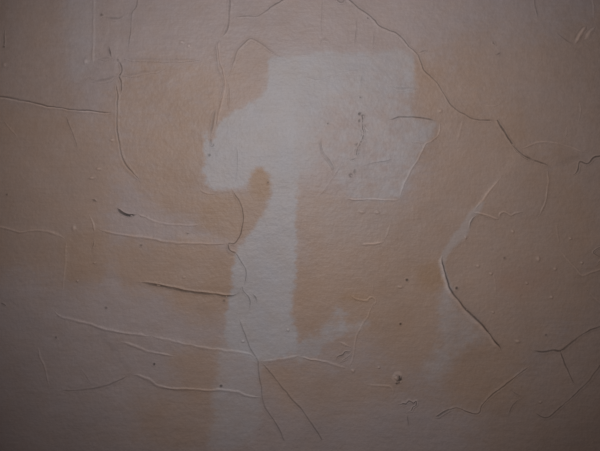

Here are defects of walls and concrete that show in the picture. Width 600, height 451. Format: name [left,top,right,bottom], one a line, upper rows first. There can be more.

crack [346,0,550,168]
crack [0,93,113,153]
crack [347,111,370,180]
crack [137,147,258,311]
crack [530,324,600,387]